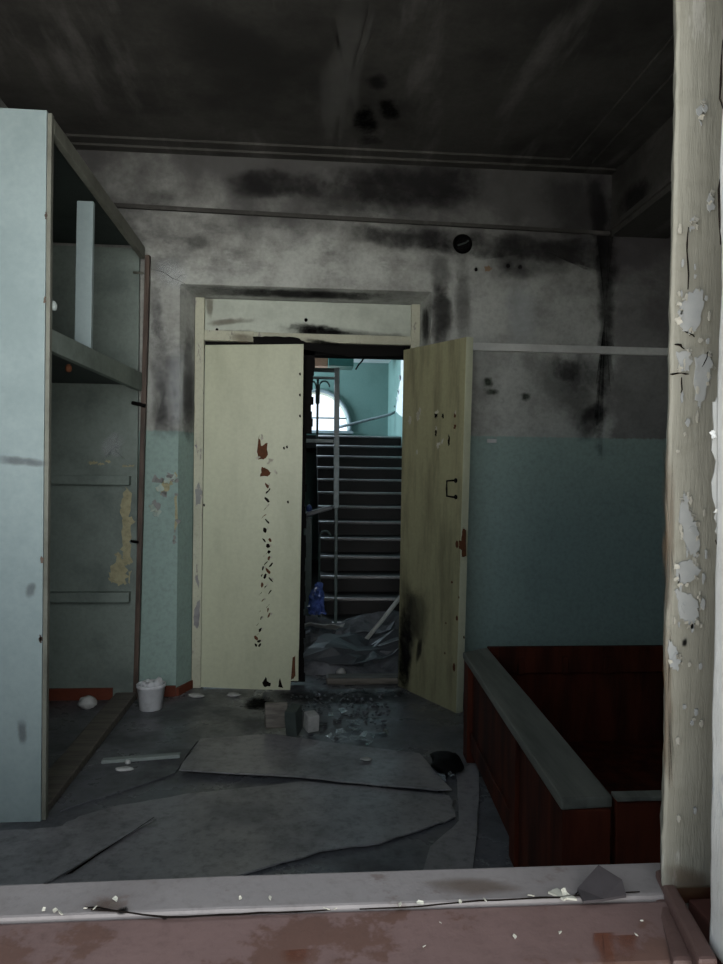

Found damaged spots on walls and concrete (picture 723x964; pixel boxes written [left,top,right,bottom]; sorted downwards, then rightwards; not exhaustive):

peeling [707,189,716,212]
water stain [296,324,345,345]
peeling [667,259,718,671]
crack [84,906,330,918]
crack [359,894,580,910]